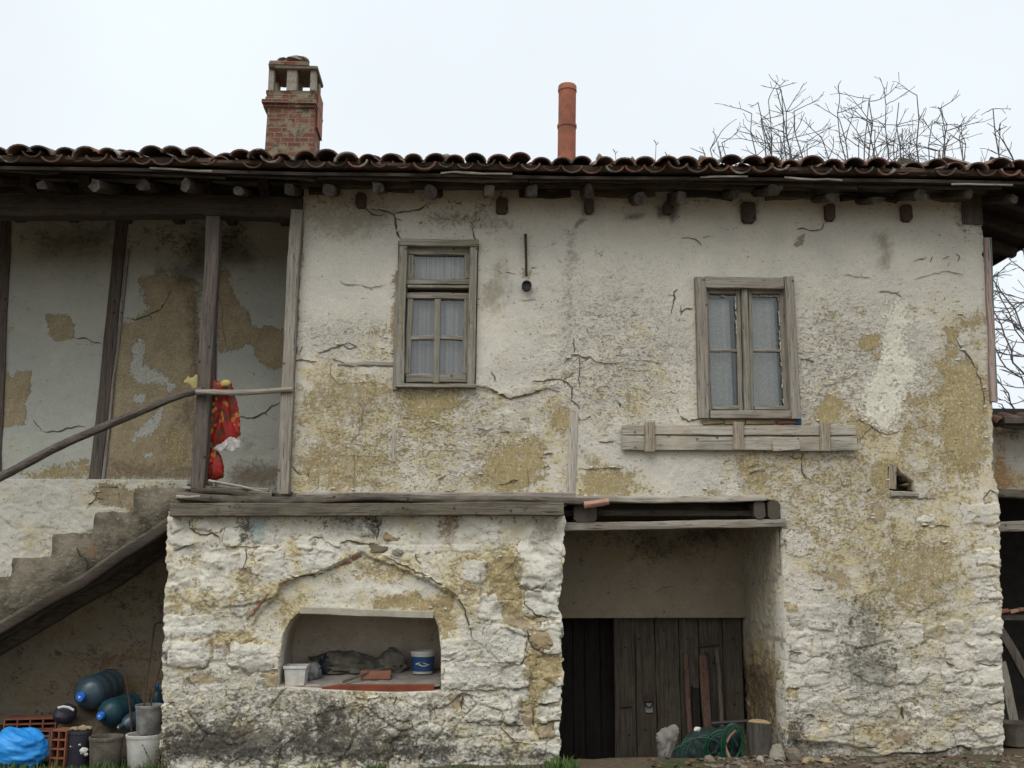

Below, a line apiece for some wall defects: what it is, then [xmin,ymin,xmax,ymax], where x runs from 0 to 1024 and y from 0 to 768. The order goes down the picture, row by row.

crack [365,204,427,238]
peeling [216,269,284,370]
peeling [3,370,32,428]
peeling [25,268,201,510]
peeling [291,426,406,493]
peeling [298,365,468,427]
peeling [475,404,574,492]
crack [476,336,663,470]
peeling [811,392,872,441]
peeling [897,306,990,477]
crack [957,340,986,411]
crack [310,523,474,640]